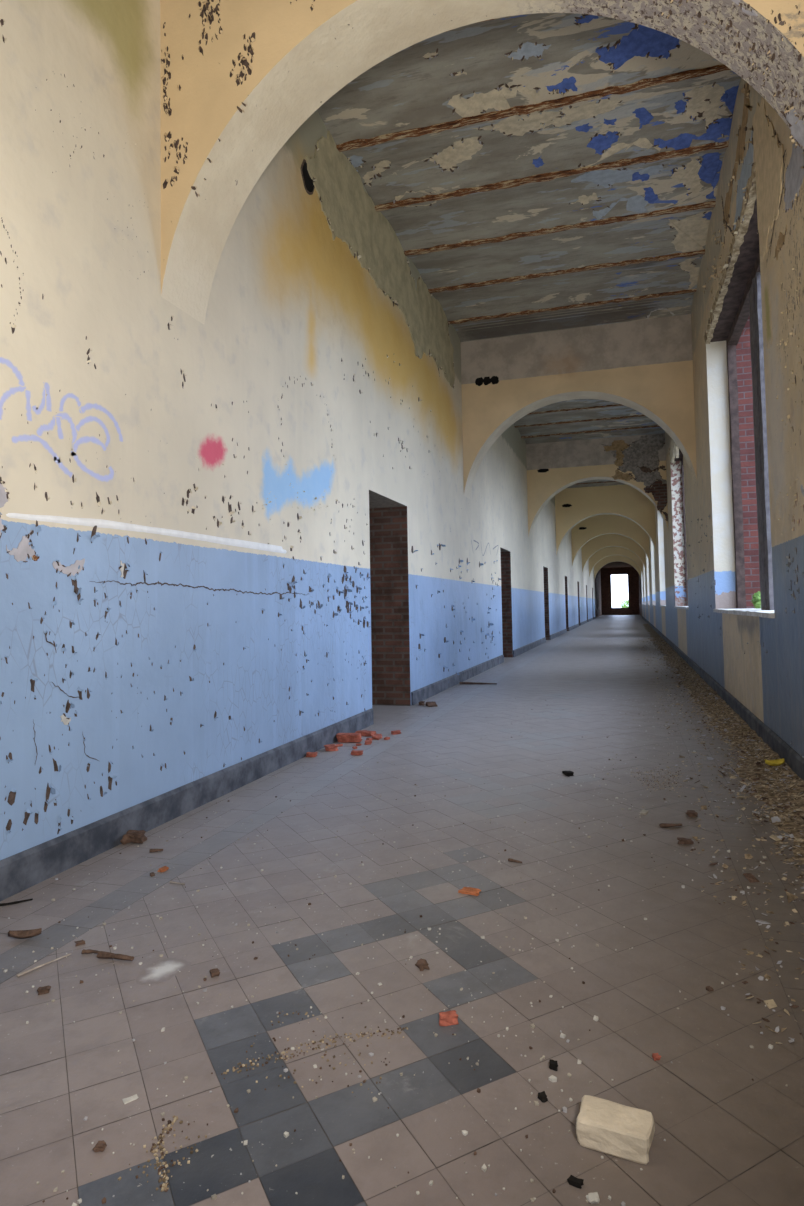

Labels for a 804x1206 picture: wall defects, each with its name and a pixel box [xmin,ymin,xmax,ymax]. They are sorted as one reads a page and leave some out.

peeling [161,22,184,116]
peeling [188,0,223,55]
peeling [230,32,255,86]
peeling [163,132,188,189]
peeling [424,0,804,290]
peeling [306,131,455,388]
peeling [601,433,679,521]
crack [89,580,305,595]
peeling [0,466,194,835]